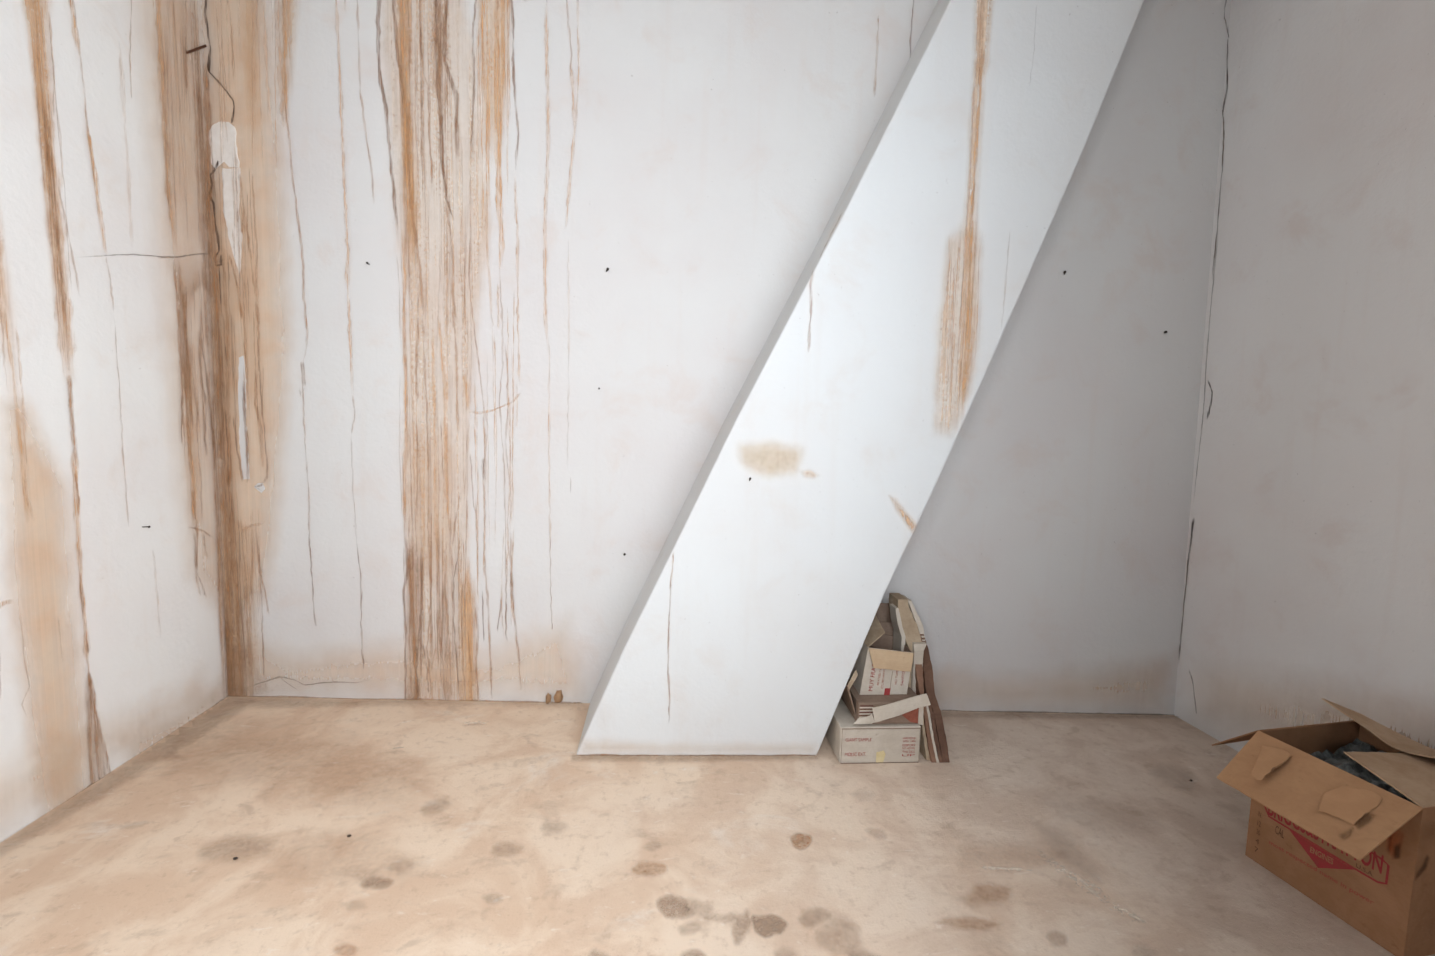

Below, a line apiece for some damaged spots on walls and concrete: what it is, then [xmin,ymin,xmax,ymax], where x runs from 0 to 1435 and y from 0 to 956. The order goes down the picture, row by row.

rust [26,0,59,248]
crack [204,0,234,123]
rust [378,0,517,241]
rust [971,0,987,205]
crack [104,161,222,299]
rust [174,0,291,696]
rust [18,422,108,806]
rust [403,531,514,701]
crack [948,520,1196,715]
damp [753,916,786,936]